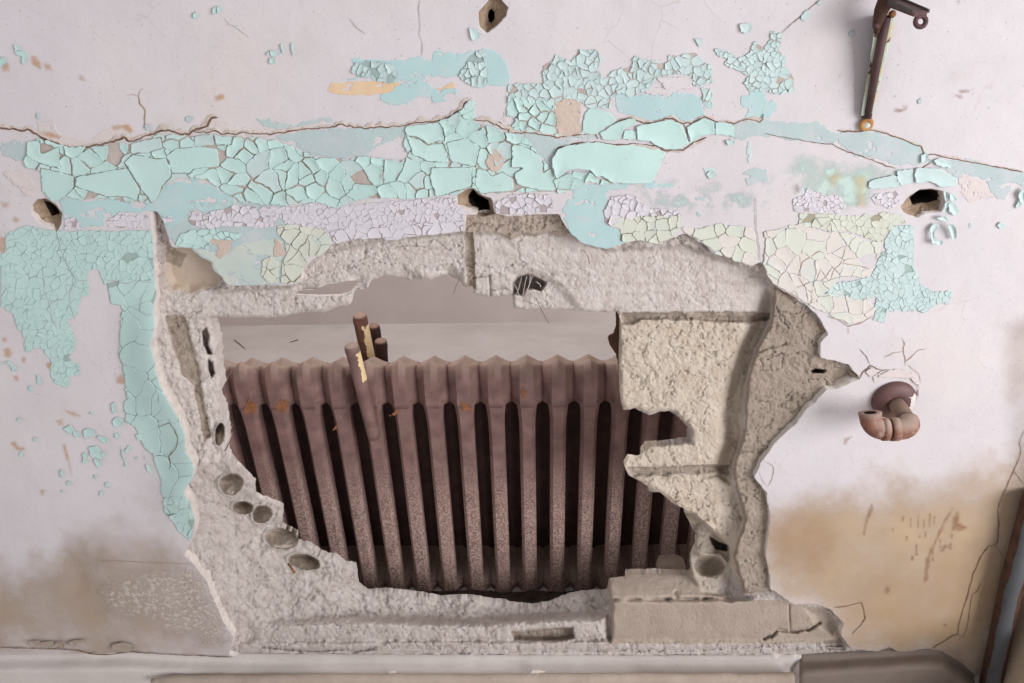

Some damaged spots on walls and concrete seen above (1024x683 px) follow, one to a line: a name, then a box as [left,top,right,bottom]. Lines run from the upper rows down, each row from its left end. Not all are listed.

spalling [469,0,508,41]
crack [0,89,1024,173]
peeling [687,31,933,166]
peeling [0,48,714,388]
crack [775,248,923,383]
peeling [64,402,152,496]
spalling [156,158,1024,656]
damp [43,559,224,653]
damp [767,486,1021,670]
crack [935,432,1024,647]